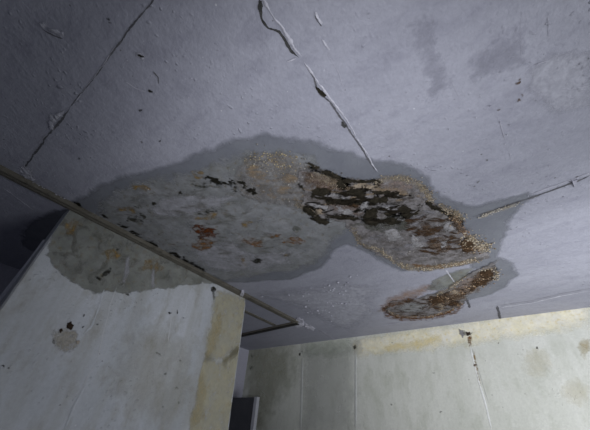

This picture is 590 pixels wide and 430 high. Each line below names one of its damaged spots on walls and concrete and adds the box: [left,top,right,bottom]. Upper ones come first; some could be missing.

crack [23,0,154,167]
crack [258,0,378,172]
corrosion [192,213,216,251]
water stain [22,134,531,299]
spalling [229,143,504,321]
spalling [55,322,80,351]
water stain [190,292,245,430]
water stain [305,308,588,355]
crack [470,346,492,430]